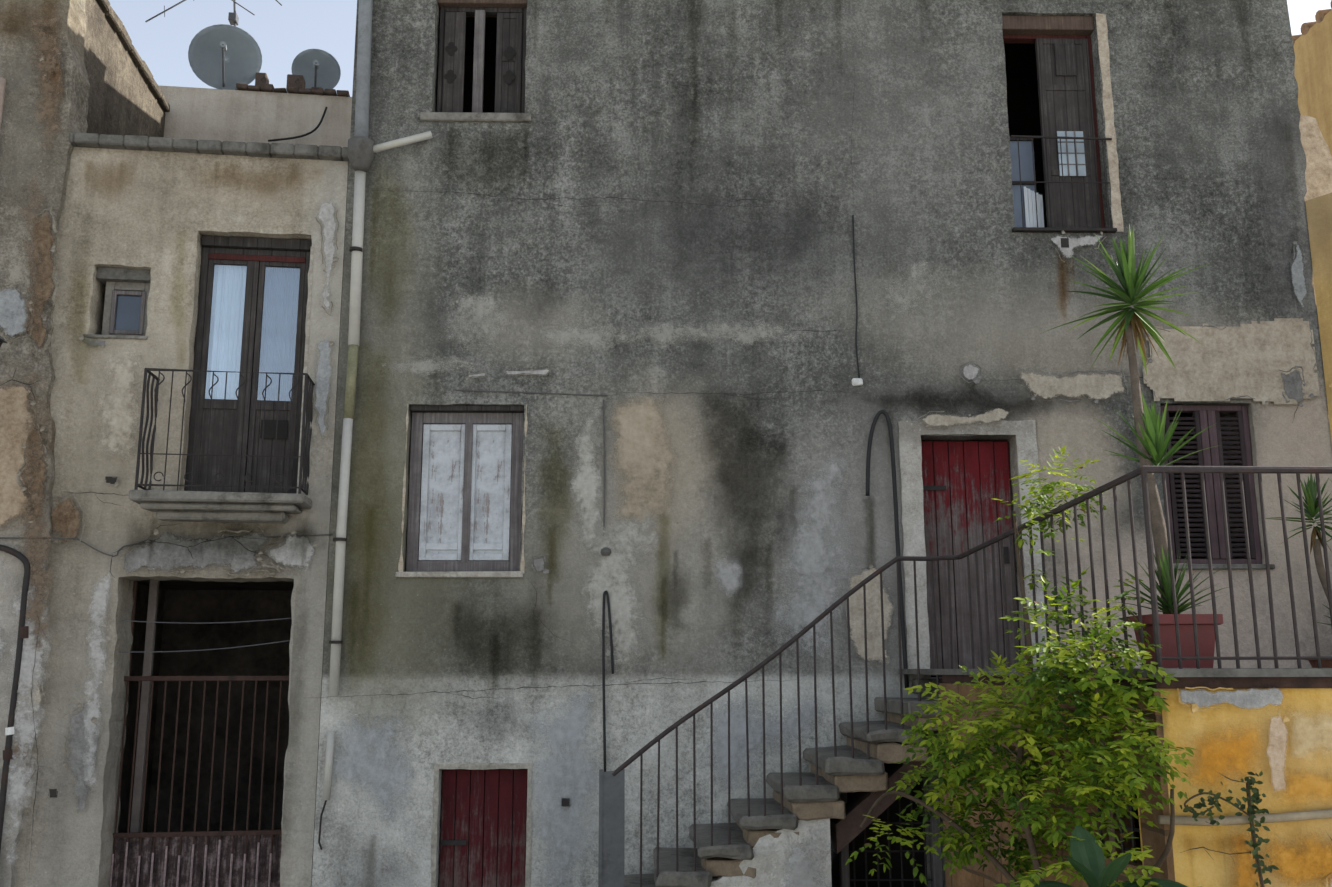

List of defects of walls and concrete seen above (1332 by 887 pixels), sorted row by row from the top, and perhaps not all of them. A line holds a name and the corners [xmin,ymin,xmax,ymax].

peeling [315,202,339,316]
peeling [1142,241,1332,407]
peeling [0,179,60,647]
peeling [1021,370,1128,403]
peeling [120,526,318,577]
water stain [717,563,741,592]
peeling [846,564,893,667]
peeling [1177,687,1290,790]